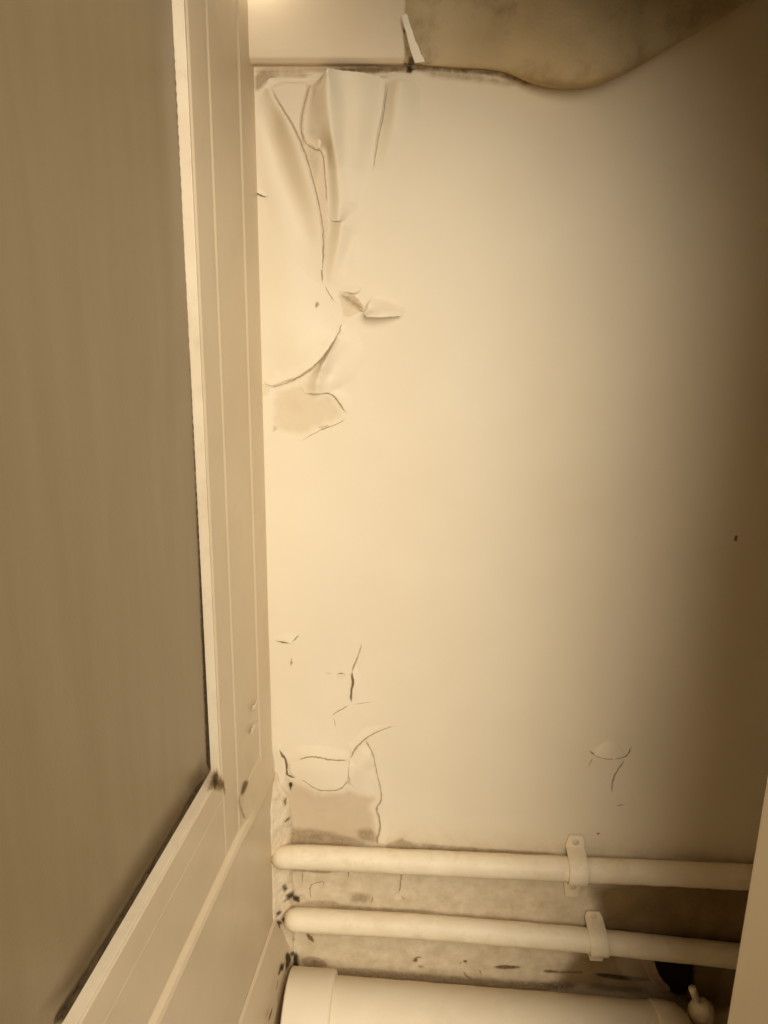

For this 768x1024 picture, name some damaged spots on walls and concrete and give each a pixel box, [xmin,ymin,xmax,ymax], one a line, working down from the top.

peeling [256,68,422,299]
peeling [262,317,365,439]
crack [329,648,368,721]
spalling [275,725,391,843]
water stain [291,830,374,845]
water stain [599,885,749,943]
water stain [276,938,325,989]
water stain [337,953,736,1010]